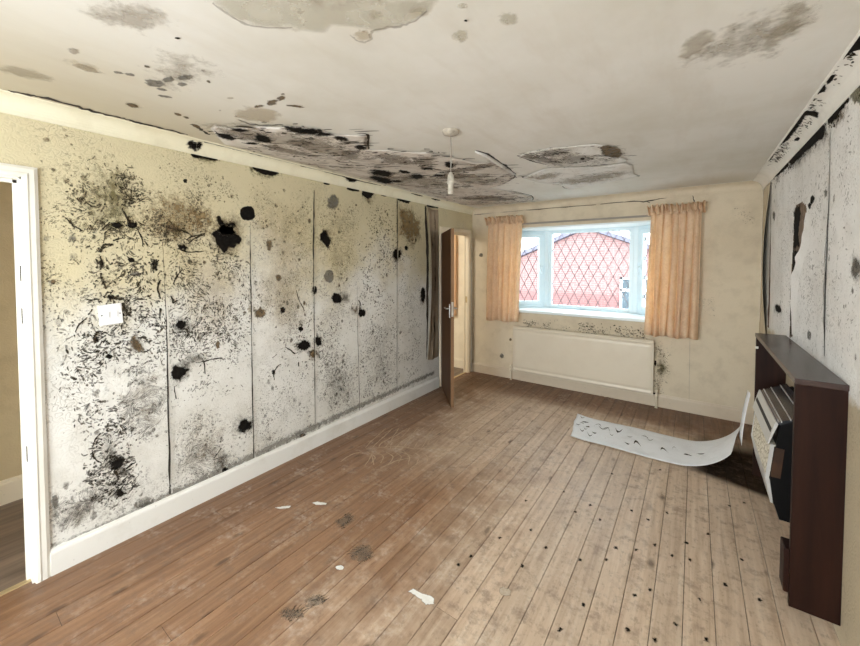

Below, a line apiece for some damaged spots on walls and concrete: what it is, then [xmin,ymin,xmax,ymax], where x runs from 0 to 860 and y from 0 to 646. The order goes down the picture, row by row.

mould [187,140,218,161]
leakage [767,36,860,186]
mould [40,156,440,519]